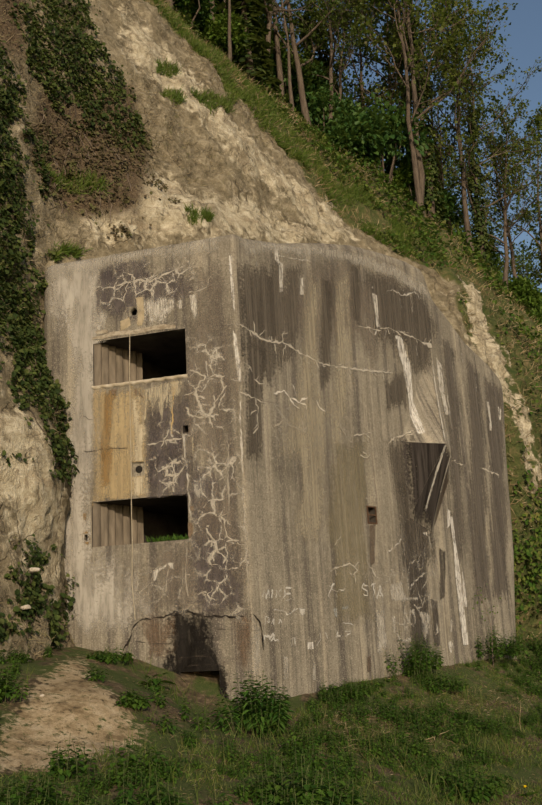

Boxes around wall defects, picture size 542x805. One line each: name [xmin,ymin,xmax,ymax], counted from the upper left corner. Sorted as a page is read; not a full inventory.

crack [94,261,211,304]
crack [228,321,393,380]
crack [364,326,432,348]
rust [93,386,146,502]
crack [123,344,325,667]
damp [44,238,510,697]
crack [340,426,413,458]
crack [331,538,431,627]